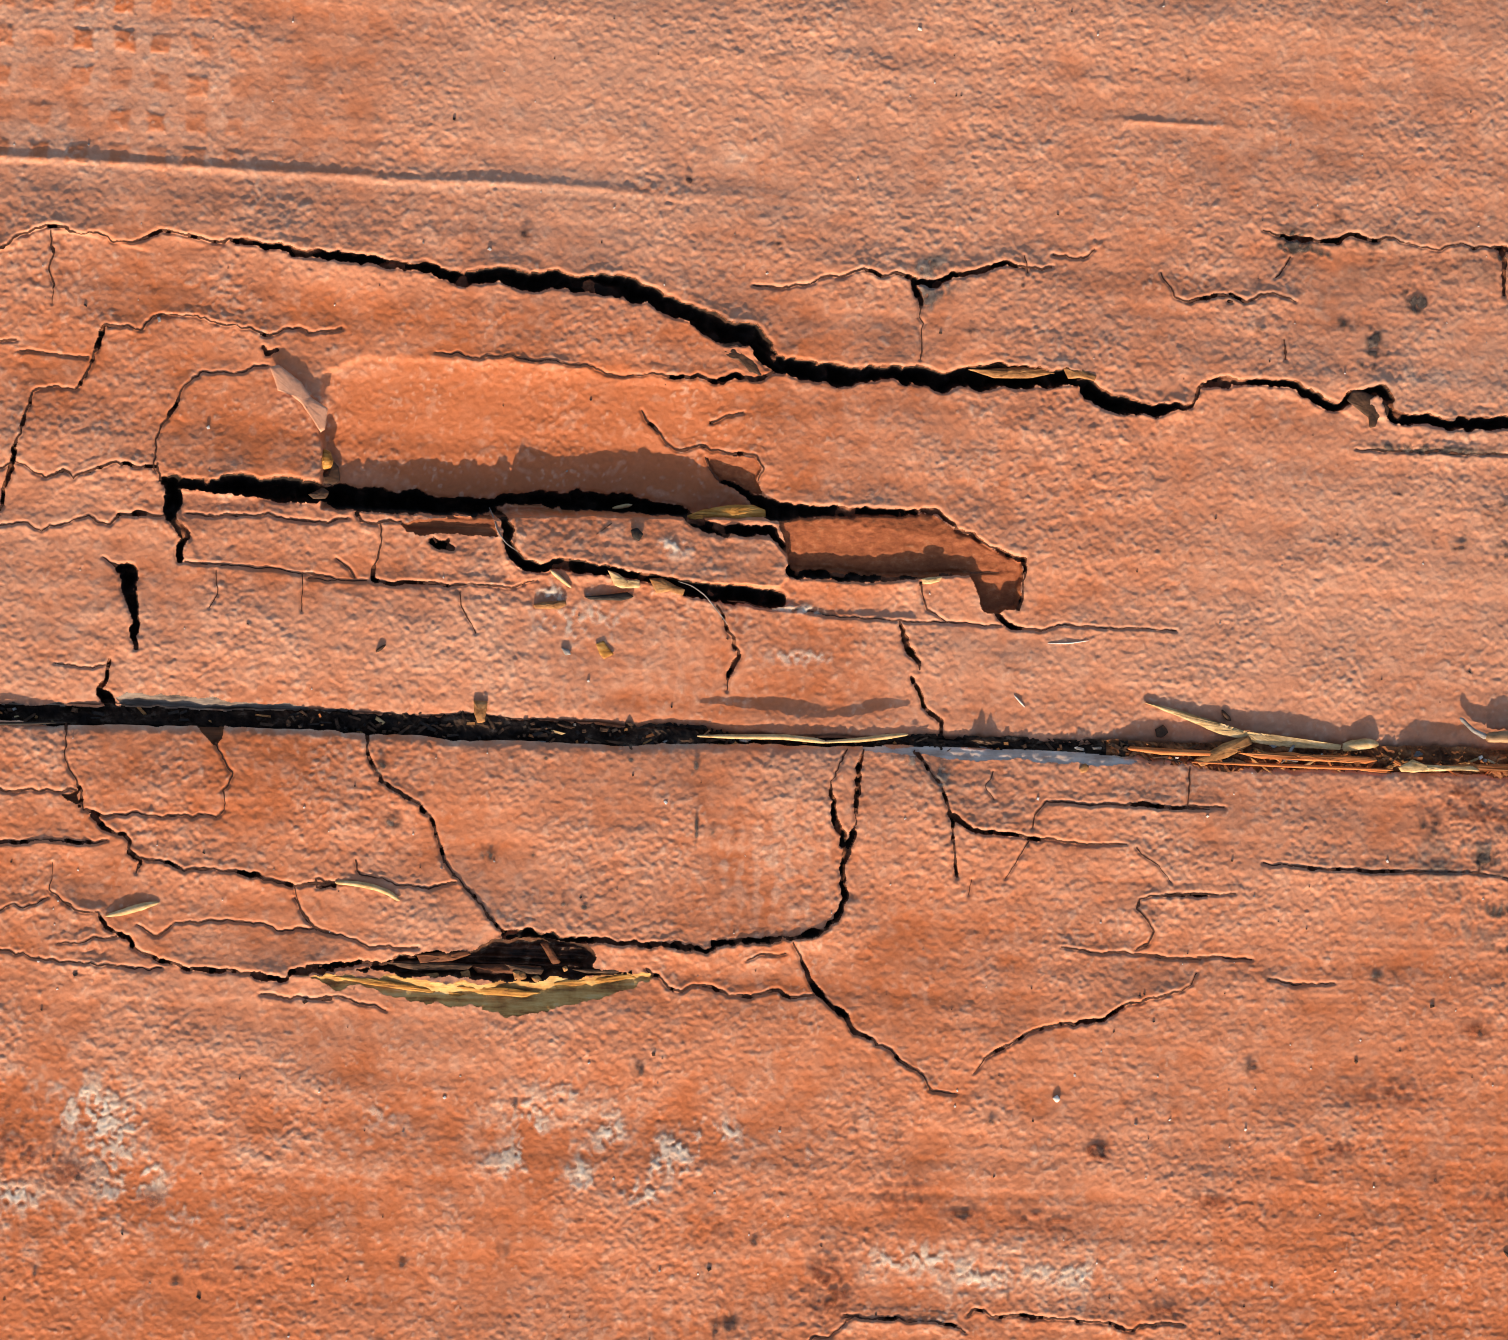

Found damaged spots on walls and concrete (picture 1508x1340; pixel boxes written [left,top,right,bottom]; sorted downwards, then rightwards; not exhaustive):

peeling [308,461,340,499]
peeling [706,455,762,495]
peeling [779,514,1023,614]
peeling [584,592,634,601]
crack [0,224,1508,1094]
spalling [356,933,633,983]
crack [810,1308,1184,1340]